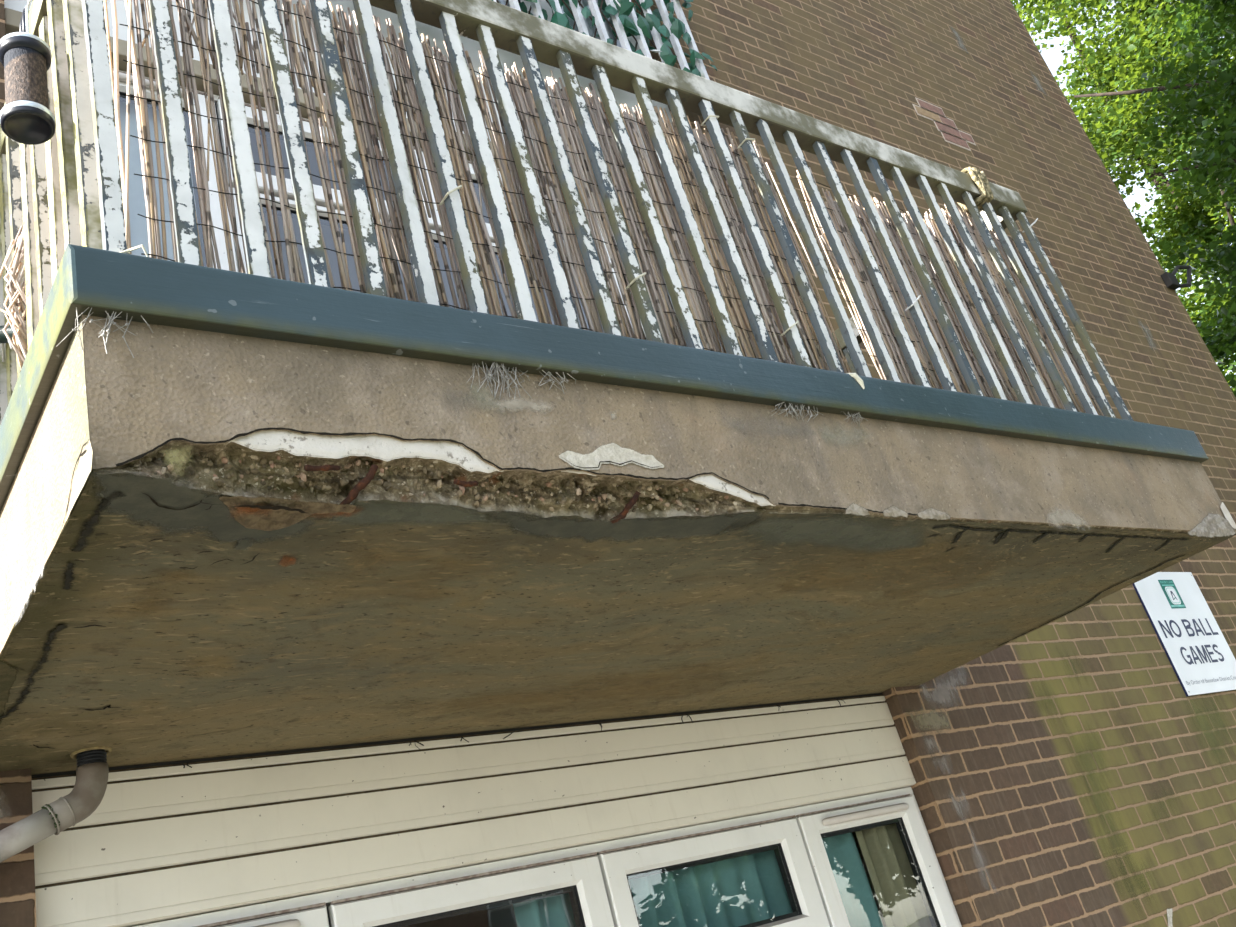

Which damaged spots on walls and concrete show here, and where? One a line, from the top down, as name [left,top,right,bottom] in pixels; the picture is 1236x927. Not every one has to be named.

spalling [60,428,1236,538]